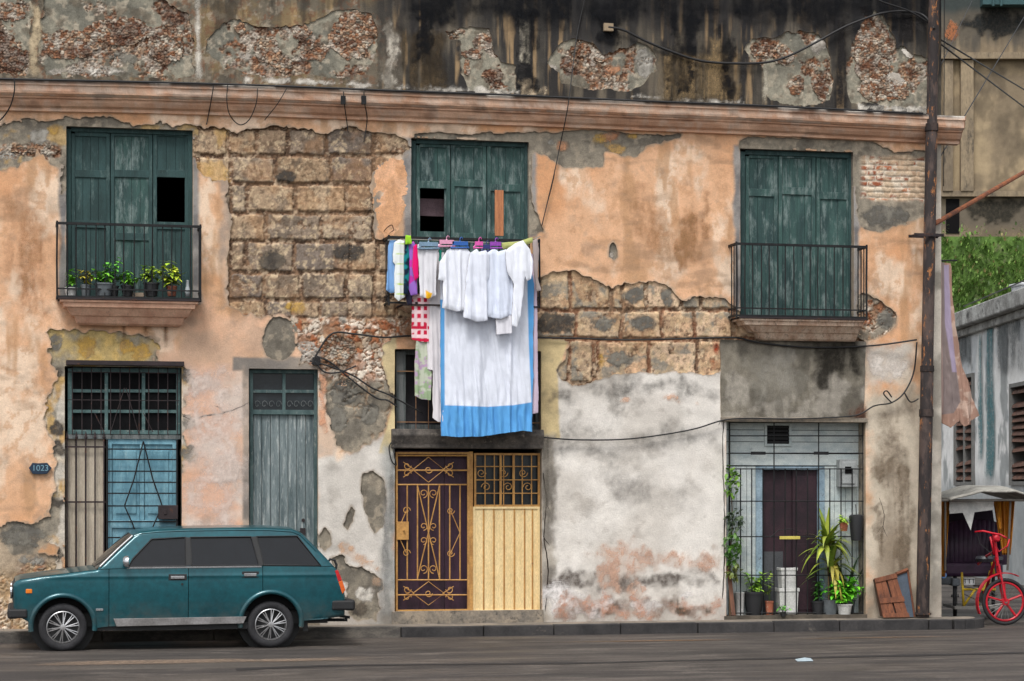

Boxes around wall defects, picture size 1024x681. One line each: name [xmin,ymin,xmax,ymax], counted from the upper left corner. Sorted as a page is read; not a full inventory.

flaking render [0,0,378,80]
water stain [387,0,572,95]
water stain [588,0,740,103]
flaking render [744,30,833,107]
water stain [733,0,928,108]
flaking render [845,10,927,109]
water stain [858,104,926,113]
flaking render [739,137,925,233]
flaking render [0,116,681,452]
flaking render [537,270,756,386]
flaking render [0,329,244,629]
water stain [543,571,691,619]